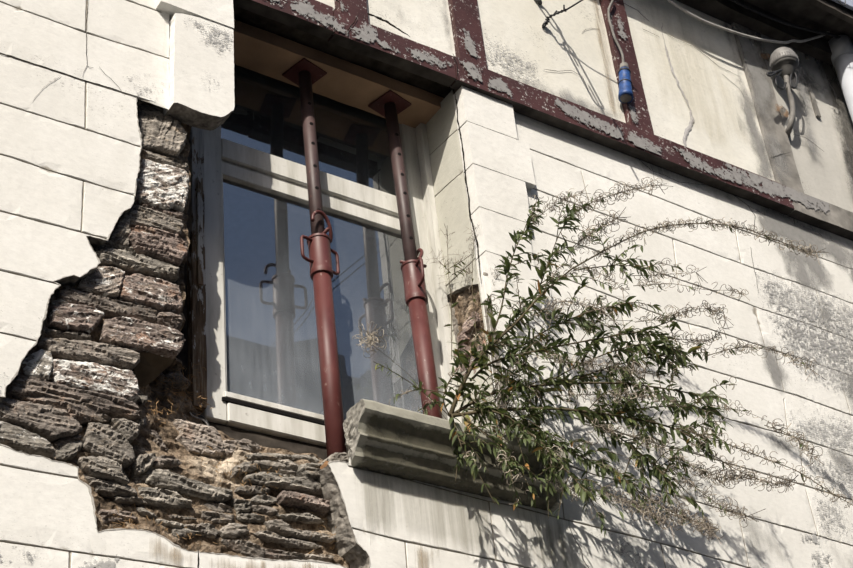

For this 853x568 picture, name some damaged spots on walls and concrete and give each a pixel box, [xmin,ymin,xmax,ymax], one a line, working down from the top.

crack [1,0,136,97]
peeling [270,0,512,97]
peeling [607,8,628,41]
crack [624,3,745,147]
crack [453,55,482,284]
peeling [554,98,664,156]
peeling [673,146,830,216]
leakage [759,208,853,288]
flaking render [0,74,371,568]
flaking render [447,284,491,376]
leakage [765,347,783,386]
leakage [831,452,853,473]